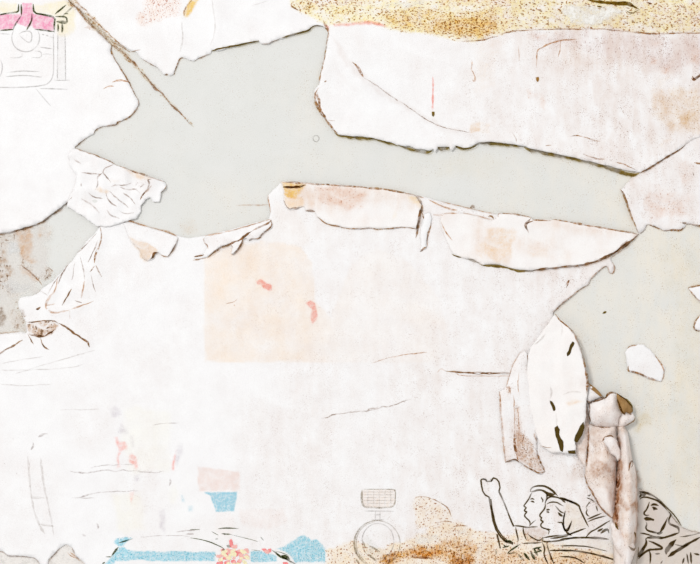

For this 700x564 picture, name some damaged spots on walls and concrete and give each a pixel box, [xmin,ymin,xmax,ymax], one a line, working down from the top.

crack [68,0,191,125]
spalling [0,222,52,335]
peeling [67,149,178,262]
peeling [281,182,639,272]
peeling [625,344,665,382]